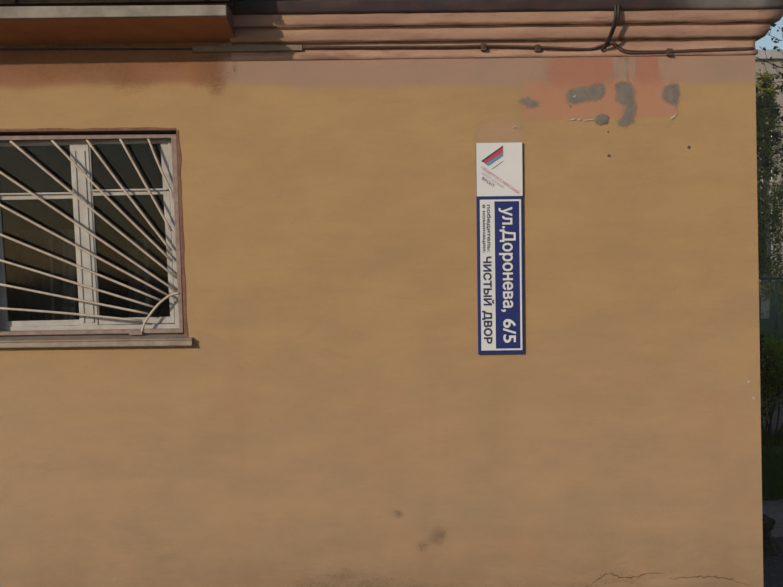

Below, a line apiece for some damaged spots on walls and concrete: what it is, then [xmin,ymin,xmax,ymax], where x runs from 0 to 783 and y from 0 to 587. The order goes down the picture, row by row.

crack [590,572,747,586]